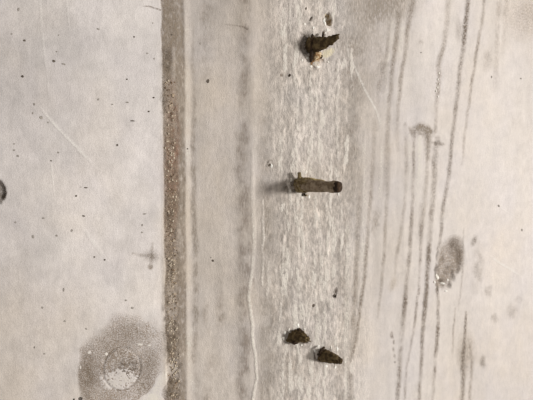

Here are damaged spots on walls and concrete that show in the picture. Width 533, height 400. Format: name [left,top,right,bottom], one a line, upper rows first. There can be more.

water stain [79,321,174,400]